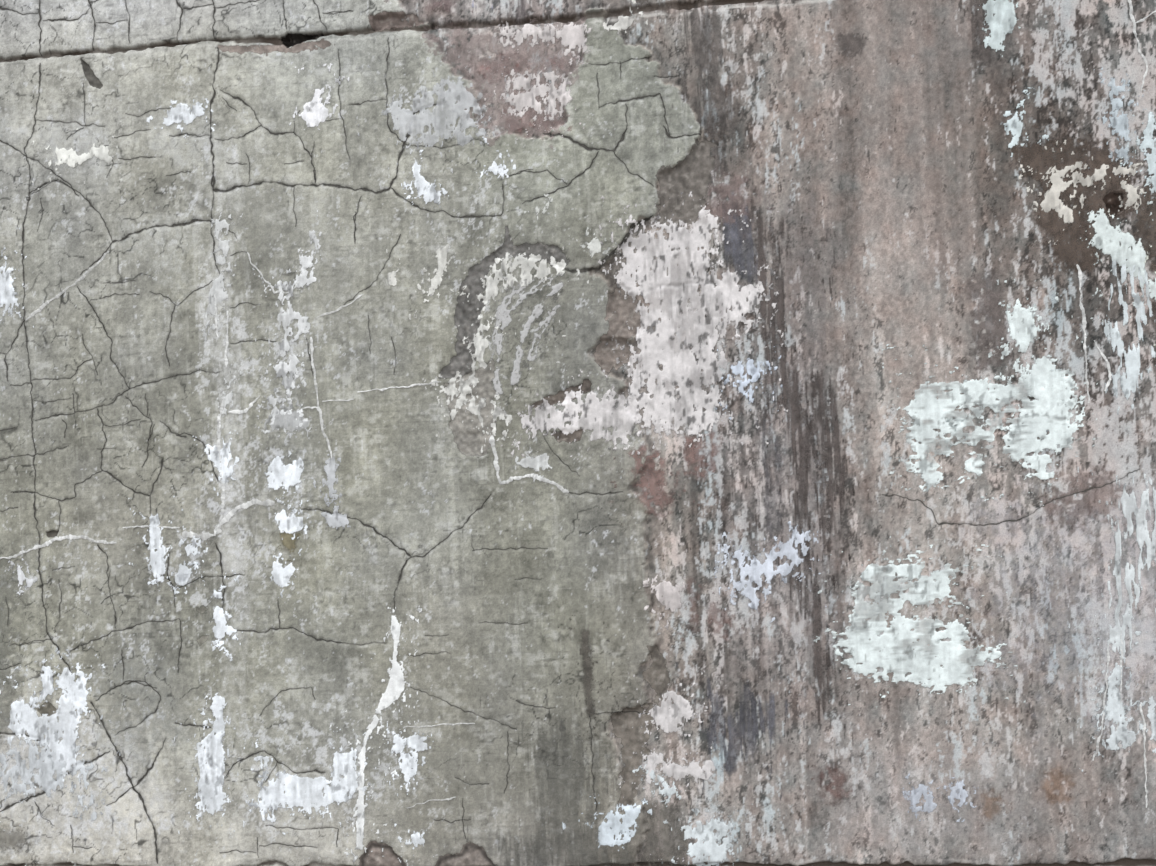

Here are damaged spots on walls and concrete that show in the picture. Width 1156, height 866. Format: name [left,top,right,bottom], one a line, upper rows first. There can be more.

peeling [382,0,648,205]
peeling [978,0,1021,57]
peeling [409,138,788,481]
peeling [889,67,1156,506]
crack [0,0,701,864]
peeling [714,521,843,610]
peeling [813,536,1017,708]
crack [882,469,1140,526]
peeling [1080,474,1156,756]
peeling [0,648,114,831]
peeling [174,599,498,866]
spalling [579,646,742,866]